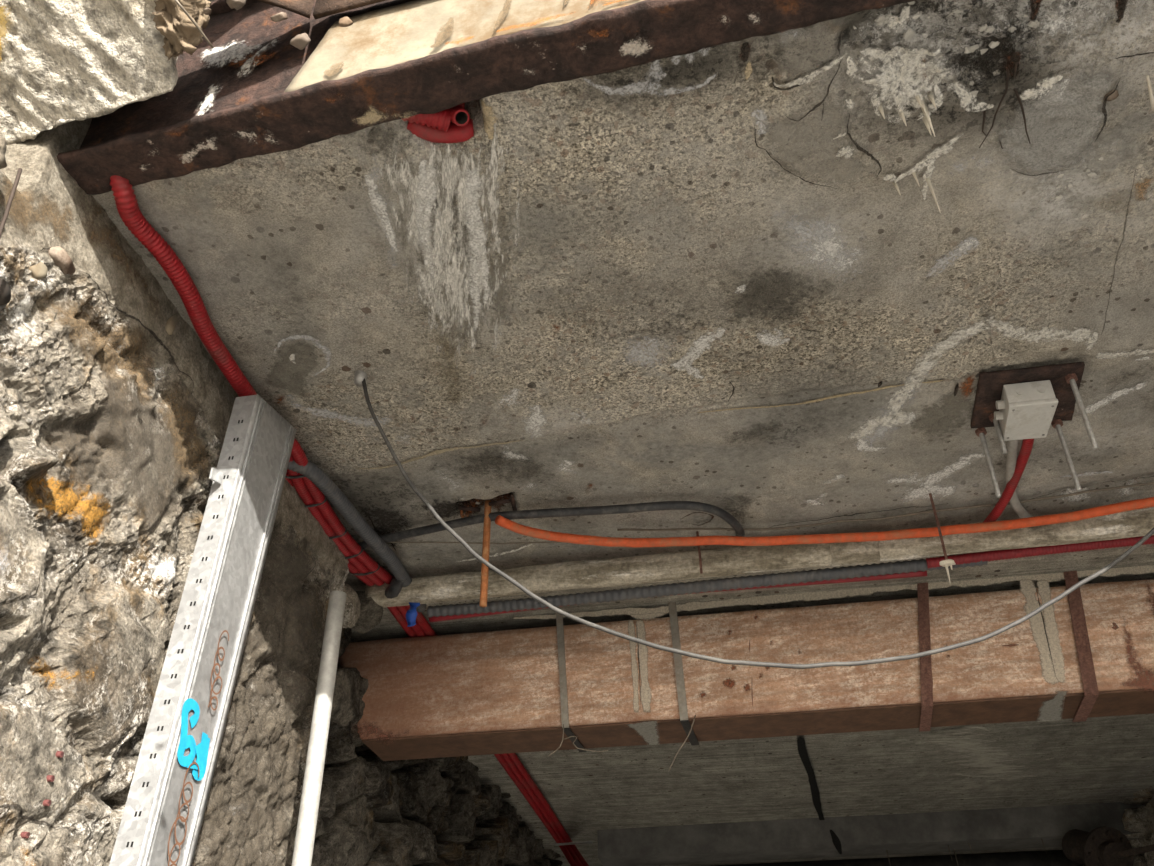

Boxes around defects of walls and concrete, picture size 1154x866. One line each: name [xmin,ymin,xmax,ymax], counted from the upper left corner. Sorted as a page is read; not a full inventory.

crack [786,31,842,121]
leakage [846,43,964,213]
spalling [853,0,1152,112]
leakage [365,121,521,398]
rust [1112,623,1154,693]
crack [797,736,842,854]